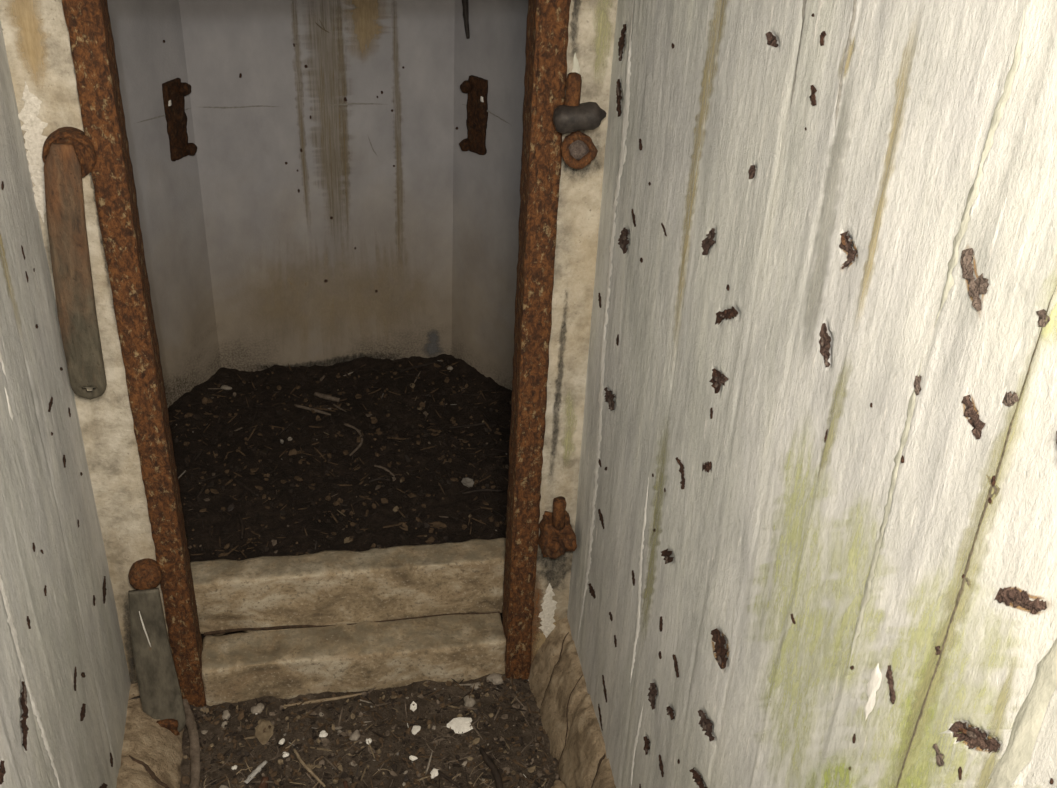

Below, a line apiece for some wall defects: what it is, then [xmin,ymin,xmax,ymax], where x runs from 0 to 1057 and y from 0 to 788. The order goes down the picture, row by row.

water stain [294,0,395,222]
water stain [820,379,845,468]
corrosion [93,576,107,606]
corrosion [531,586,542,662]
corrosion [598,675,607,731]